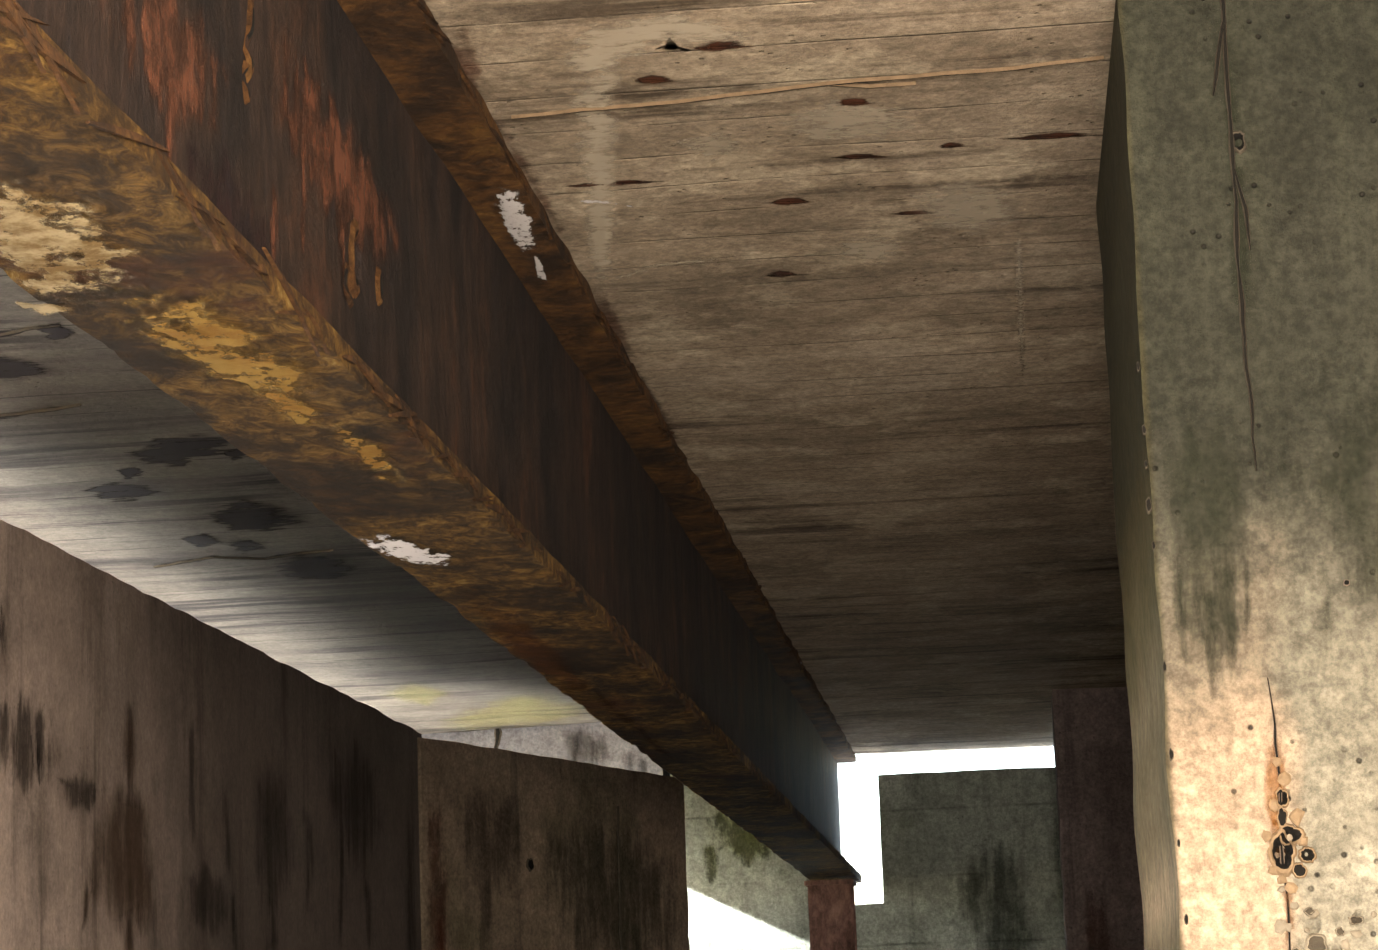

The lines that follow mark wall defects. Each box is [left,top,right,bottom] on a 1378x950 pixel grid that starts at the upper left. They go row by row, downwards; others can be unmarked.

corrosion [635,75,672,84]
corrosion [696,41,751,51]
corrosion [209,154,278,260]
peeling [362,535,450,566]
damp [1,698,51,792]
damp [62,777,96,809]
damp [84,796,151,950]
spalling [1261,757,1378,950]